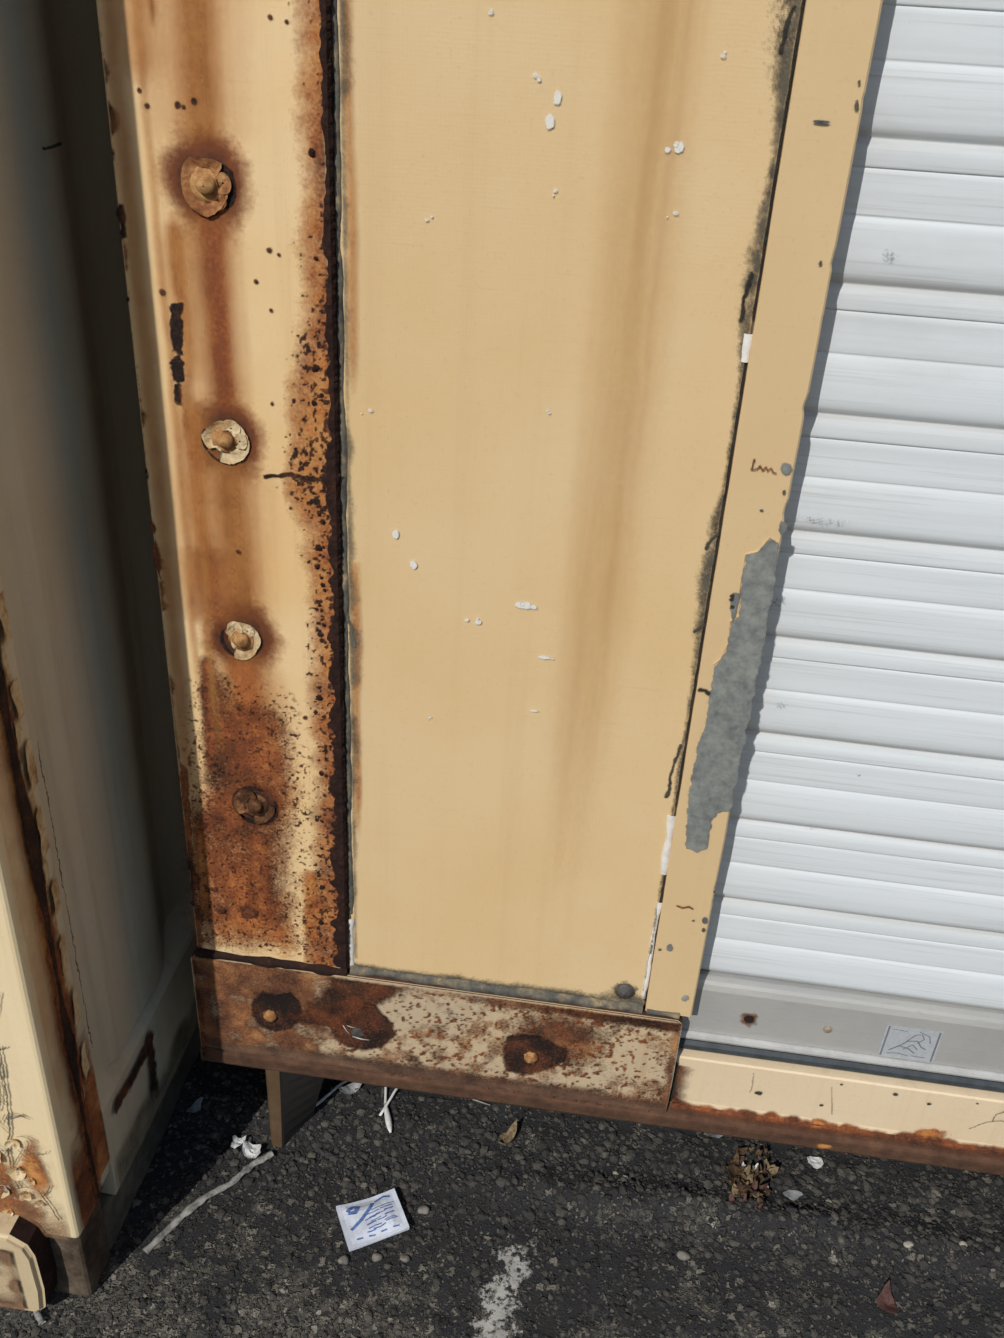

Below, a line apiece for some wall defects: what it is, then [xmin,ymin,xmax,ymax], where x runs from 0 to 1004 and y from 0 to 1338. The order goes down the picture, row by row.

corrosion [116,204,128,270]
corrosion [159,0,1004,1155]
peeling [685,521,788,853]
corrosion [0,1145,49,1225]
corrosion [73,1043,110,1229]